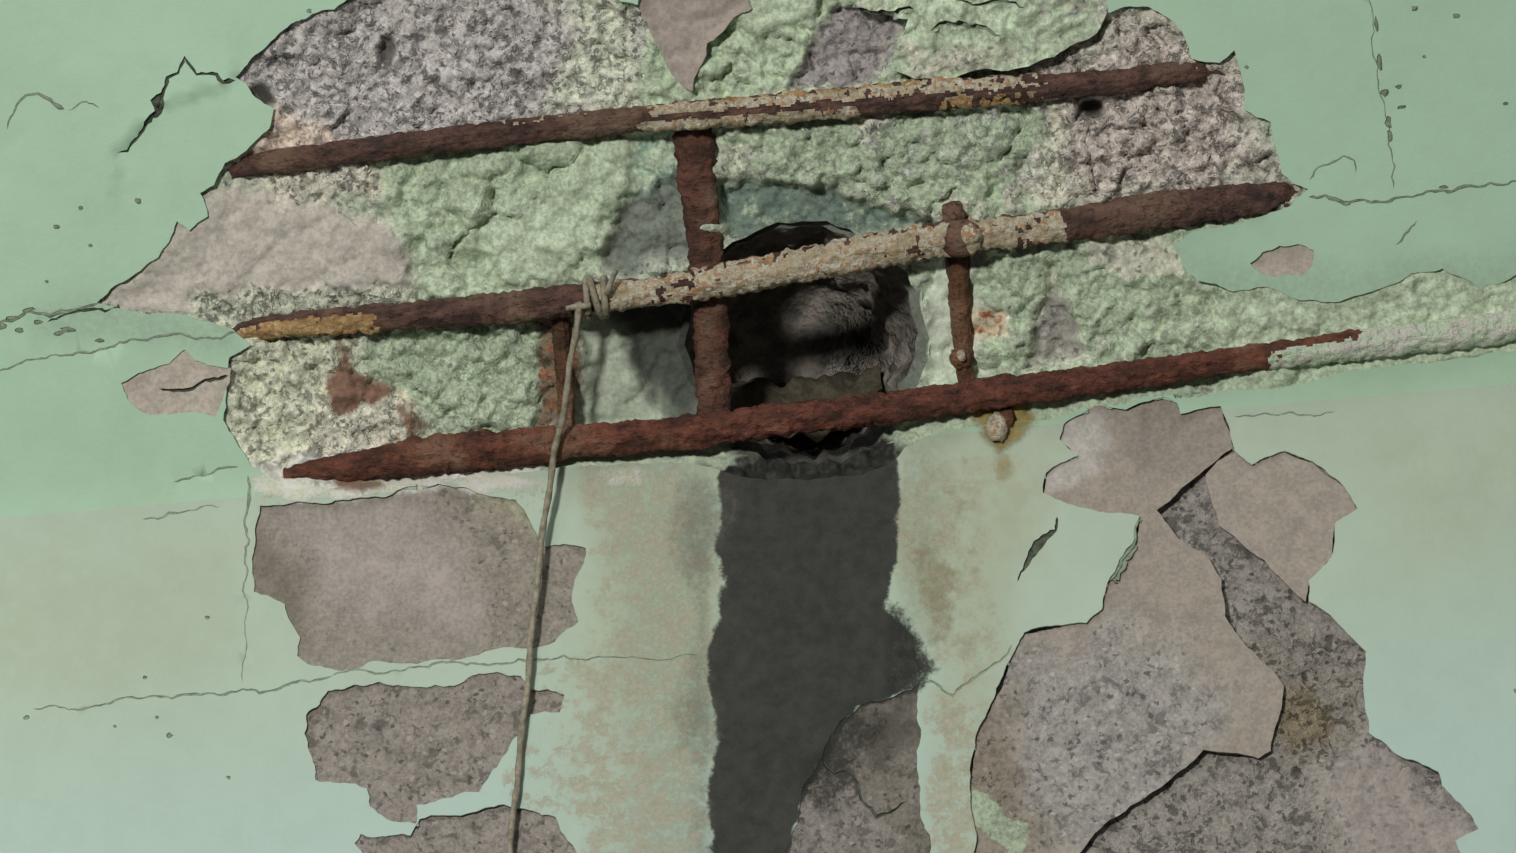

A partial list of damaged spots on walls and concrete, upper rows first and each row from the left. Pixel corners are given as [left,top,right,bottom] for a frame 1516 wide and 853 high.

crack [7,92,98,128]
crack [117,56,235,153]
crack [1310,0,1516,245]
spalling [97,0,1307,488]
crack [0,302,235,371]
rust [327,338,422,432]
efflorescence [253,472,537,504]
peeling [252,484,538,671]
water stain [696,440,934,853]
rust [973,404,1033,447]
flaking render [556,215,1516,853]
peeling [305,673,576,853]